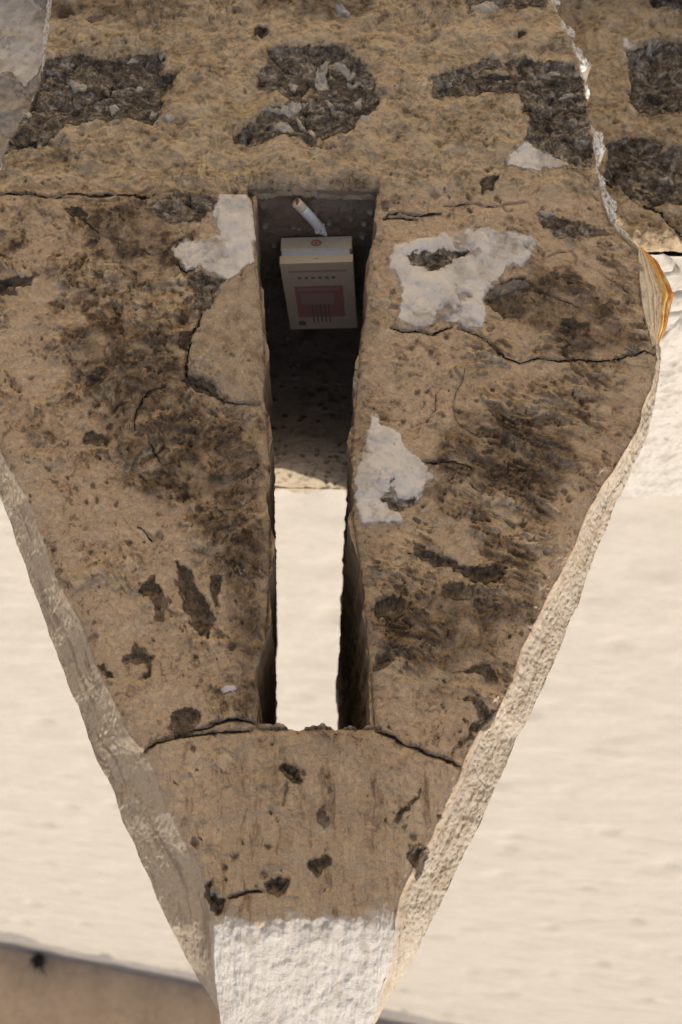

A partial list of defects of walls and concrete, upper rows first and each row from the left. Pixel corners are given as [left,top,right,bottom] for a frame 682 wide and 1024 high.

spalling [0,0,177,154]
spalling [233,26,380,148]
spalling [622,37,682,117]
spalling [429,56,682,207]
crack [0,192,156,233]
crack [185,314,202,376]
crack [393,327,654,364]
leakage [118,407,240,500]
spalling [138,561,223,638]
spalling [168,707,200,738]
crack [143,718,254,753]
crack [377,732,460,767]